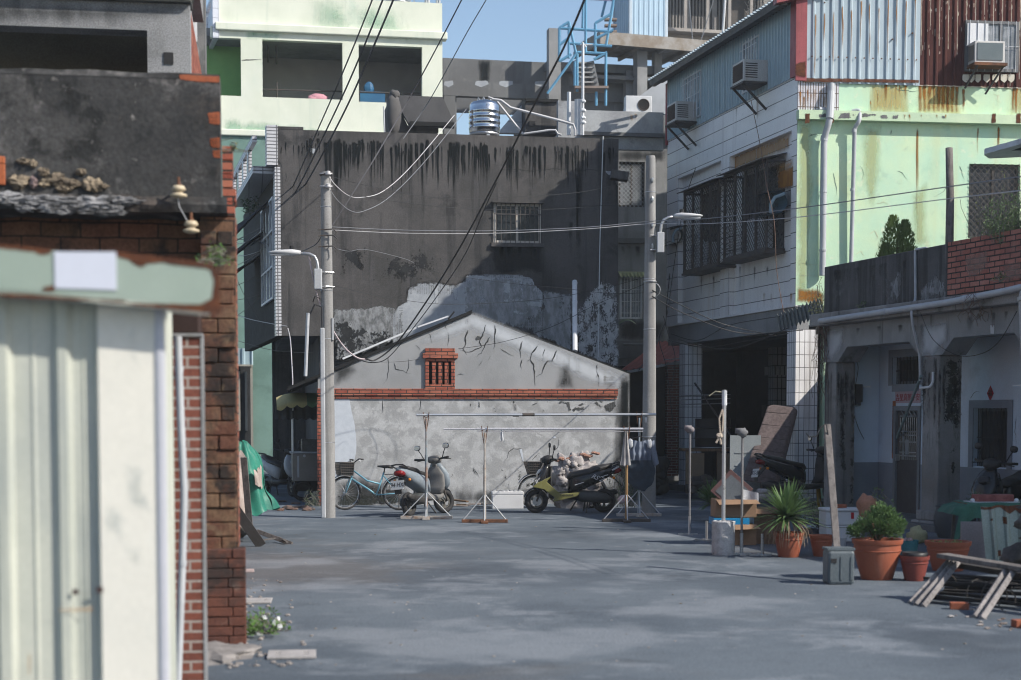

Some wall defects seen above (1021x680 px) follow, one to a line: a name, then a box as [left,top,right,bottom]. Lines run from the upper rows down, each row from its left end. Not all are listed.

corrosion [795,0,1021,110]
water stain [281,133,588,229]
crack [382,325,556,407]
peeling [333,273,619,366]
water stain [825,373,855,504]
water stain [921,357,962,437]